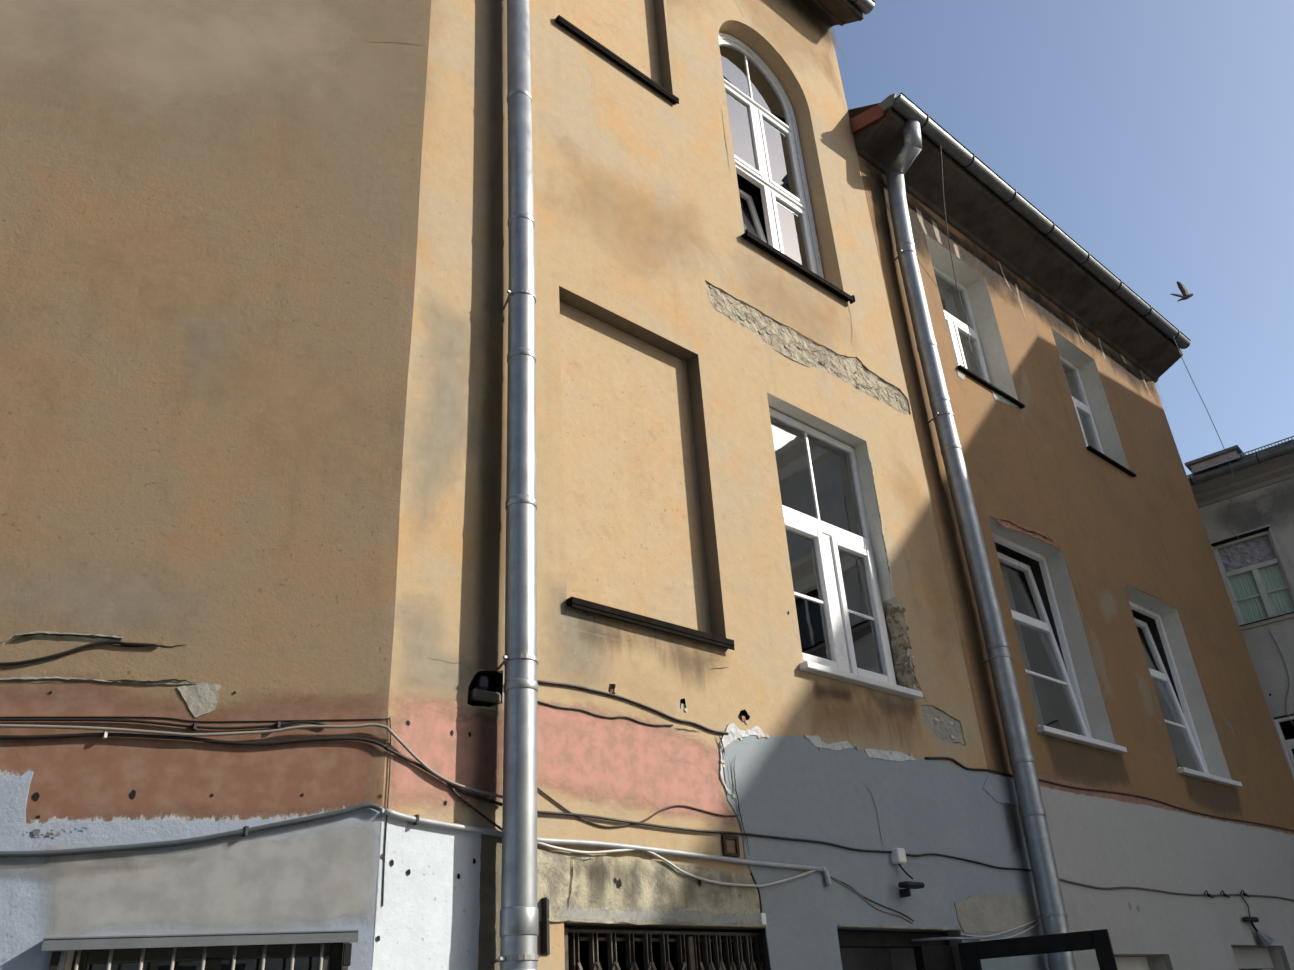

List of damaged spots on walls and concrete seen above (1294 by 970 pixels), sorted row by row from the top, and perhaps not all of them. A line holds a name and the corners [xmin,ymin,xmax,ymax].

leakage [907,202,1153,396]
flaking render [705,280,911,415]
peeling [719,710,769,798]
peeling [803,735,917,762]
flaking render [921,705,966,746]
peeling [26,827,87,837]